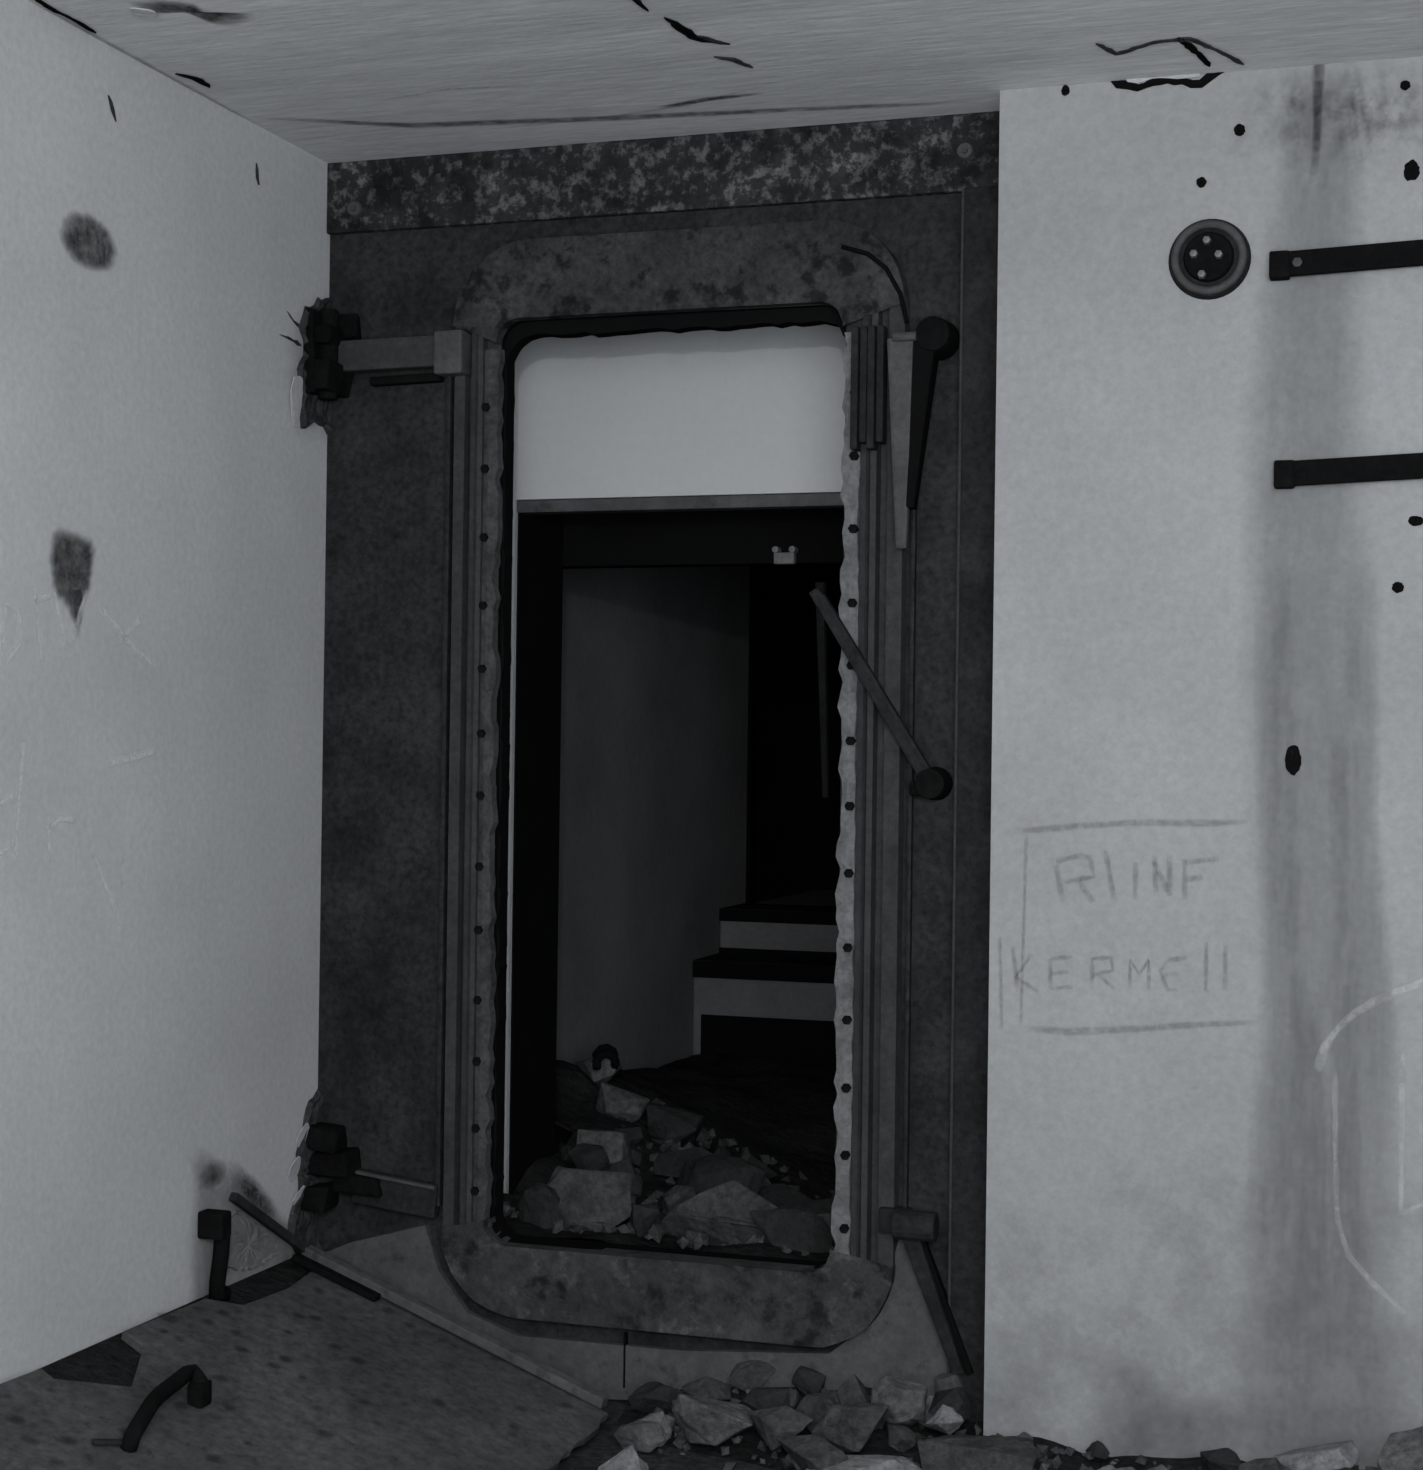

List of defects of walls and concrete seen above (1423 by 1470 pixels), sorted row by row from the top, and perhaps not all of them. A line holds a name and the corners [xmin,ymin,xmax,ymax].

crack [632,0,753,107]
water stain [65,218,113,267]